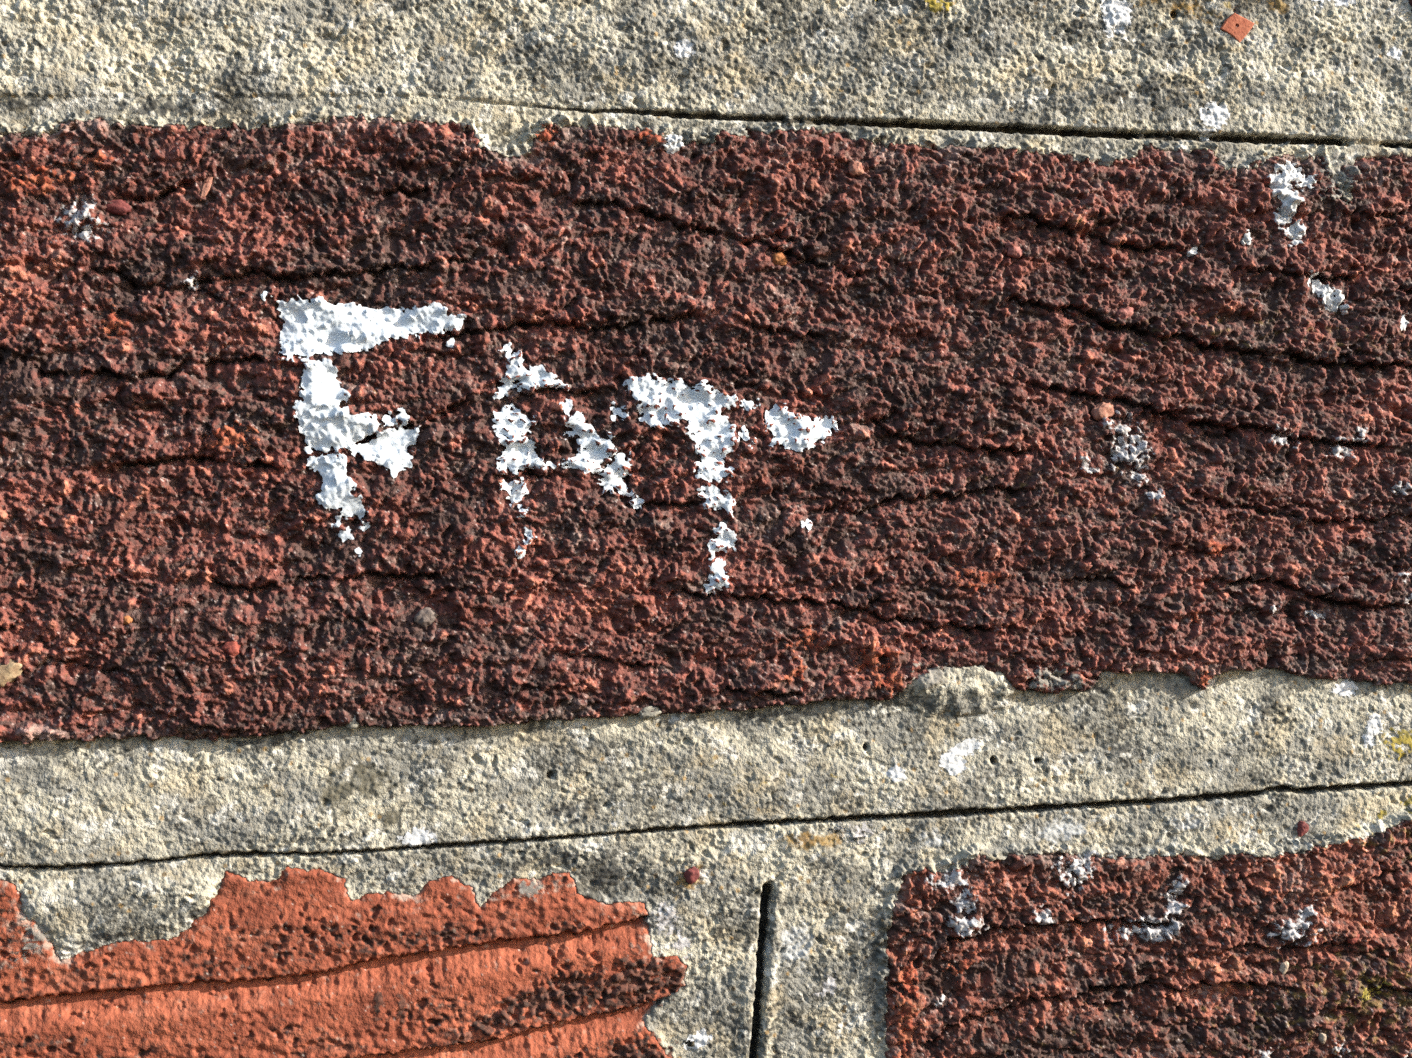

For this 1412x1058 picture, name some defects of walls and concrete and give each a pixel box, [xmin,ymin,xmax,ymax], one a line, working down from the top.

crack [0,781,1412,869]